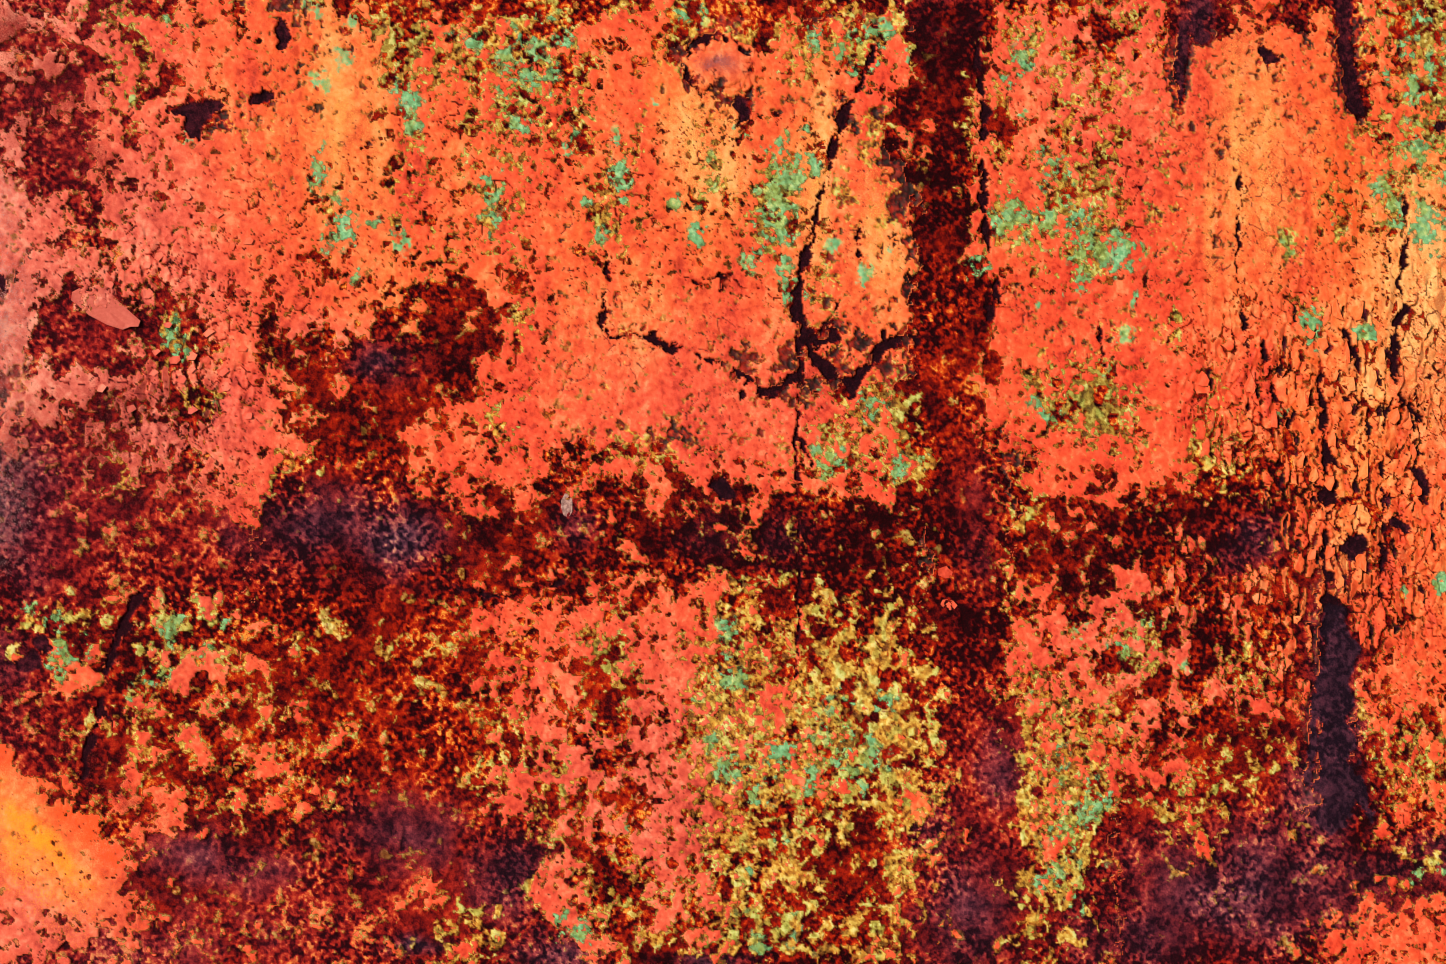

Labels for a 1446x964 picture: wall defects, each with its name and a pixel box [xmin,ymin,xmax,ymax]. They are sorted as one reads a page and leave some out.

rust [265,229,306,270]
peeling [285,0,848,313]
crack [681,29,751,98]
crack [597,45,926,678]
rust [791,92,833,293]
rust [1055,464,1077,488]
peeling [989,0,1446,806]
crack [1234,167,1424,608]
peeling [0,600,297,849]
peeling [494,593,957,964]
peeling [1010,617,1123,964]
rust [8,949,33,964]